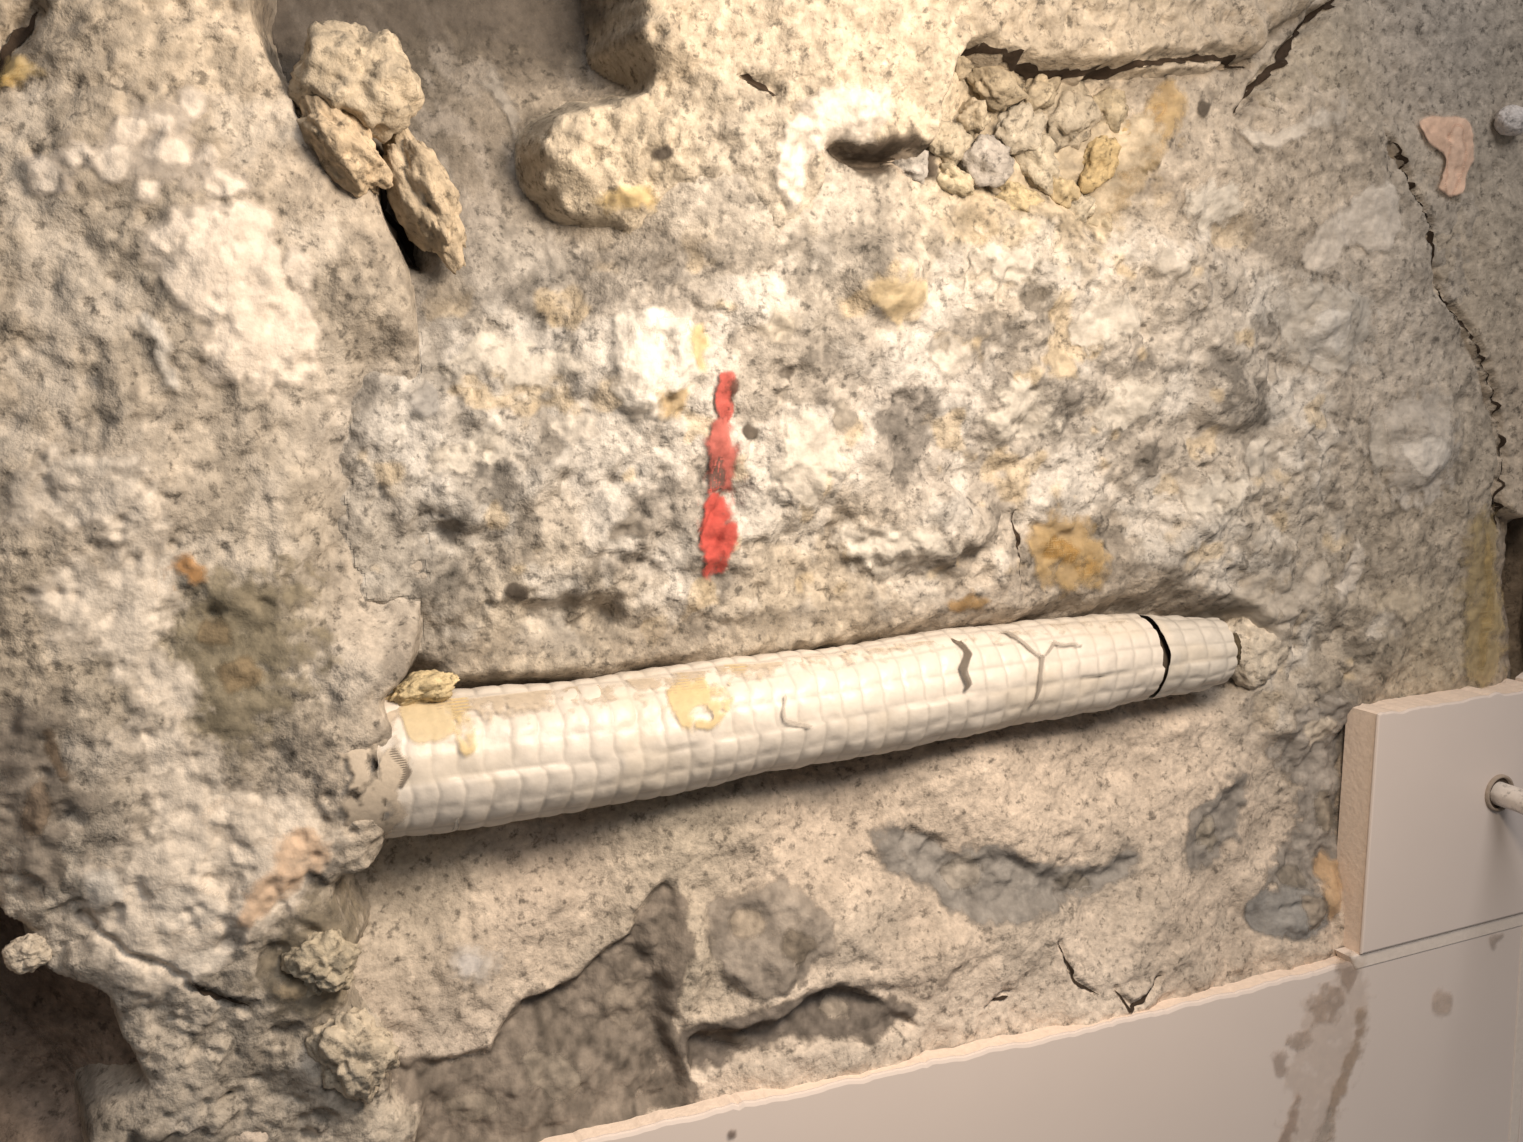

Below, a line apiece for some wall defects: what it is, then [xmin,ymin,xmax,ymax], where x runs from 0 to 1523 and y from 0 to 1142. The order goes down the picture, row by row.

crack [961,0,1336,113]
spalling [1494,104,1523,136]
crack [1389,142,1506,533]
spalling [273,0,1405,940]
spalling [170,554,333,751]
spalling [1501,518,1523,680]
spalling [0,703,96,901]
spalling [0,994,81,1142]
spalling [127,1133,201,1142]
spalling [248,876,369,1017]
spalling [384,877,916,1142]